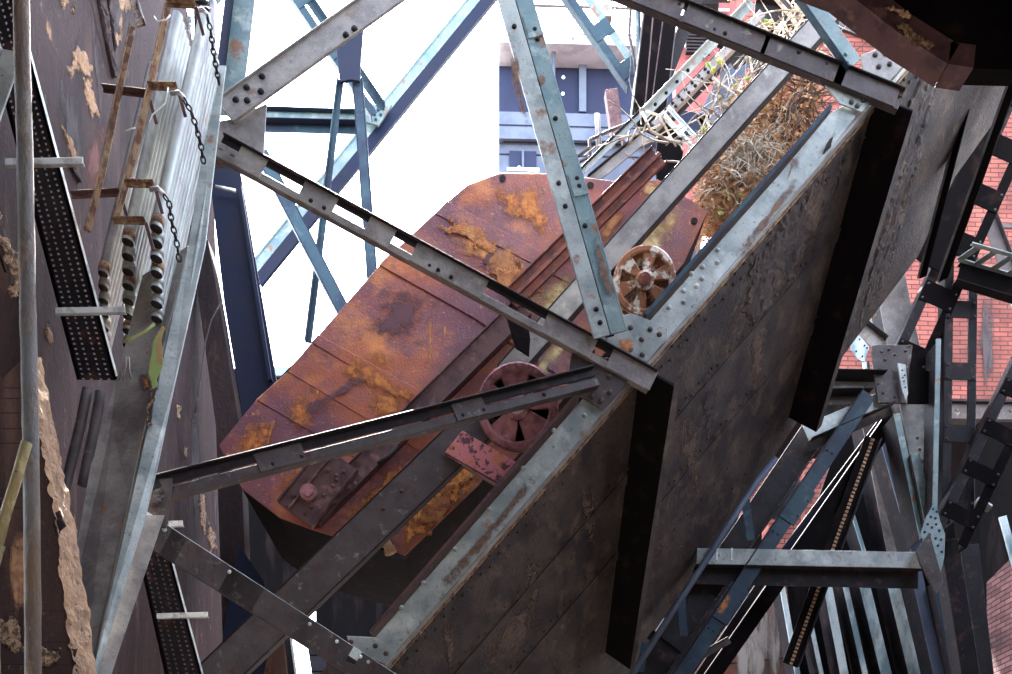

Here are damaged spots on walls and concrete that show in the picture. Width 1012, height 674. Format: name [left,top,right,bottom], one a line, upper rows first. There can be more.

spalling [110,0,131,45]
spalling [67,42,100,120]
corrosion [487,187,548,232]
corrosion [457,233,522,277]
corrosion [594,213,624,293]
corrosion [373,291,432,358]
corrosion [287,352,414,426]
corrosion [239,422,274,452]
corrosion [405,469,474,542]
corrosion [445,479,535,584]